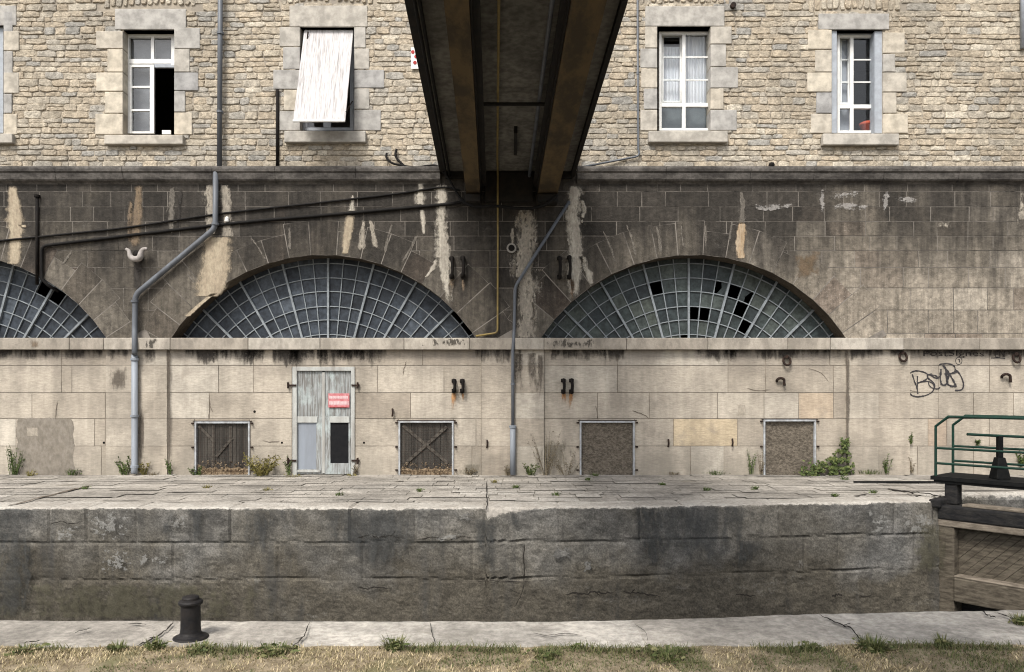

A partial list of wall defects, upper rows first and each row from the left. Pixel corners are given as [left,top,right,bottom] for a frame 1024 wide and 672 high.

damp [6,187,26,264]
damp [342,195,392,254]
damp [402,184,452,298]
damp [565,186,593,296]
damp [729,191,792,258]
damp [186,350,382,366]
damp [422,339,624,386]
crack [566,589,661,597]
crack [819,593,871,638]